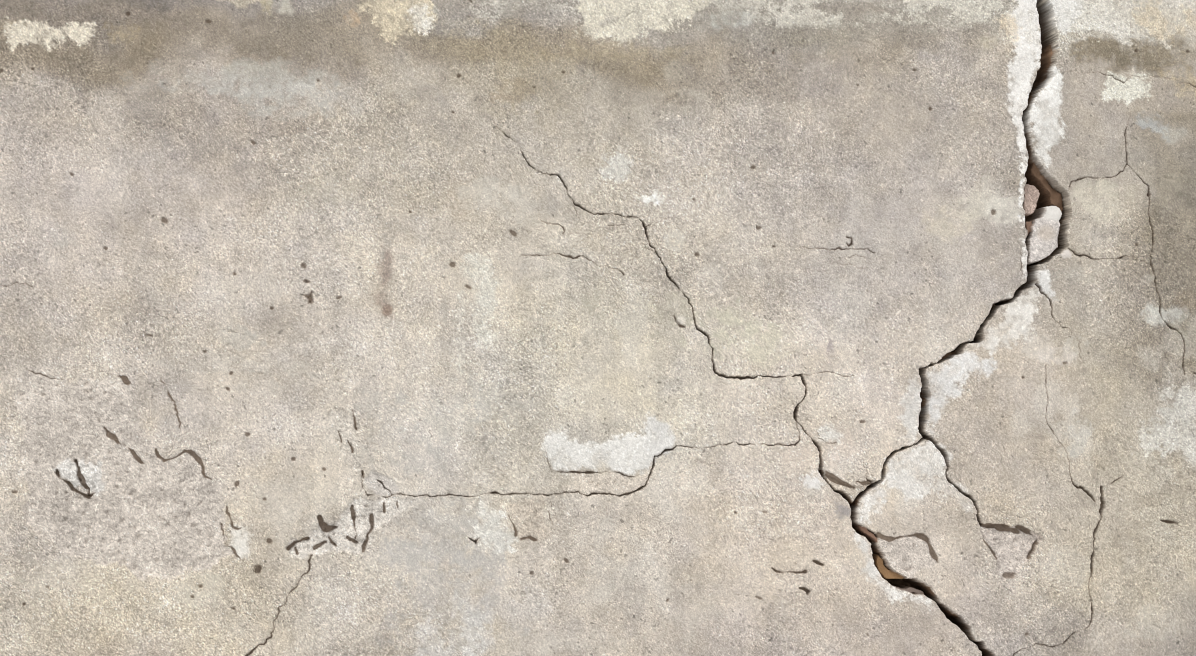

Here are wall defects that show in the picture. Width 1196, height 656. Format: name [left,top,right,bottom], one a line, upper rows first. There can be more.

spalling [215,0,263,9]
crack [361,0,1196,656]
spalling [12,366,263,599]
spalling [266,409,419,560]
crack [245,554,314,656]